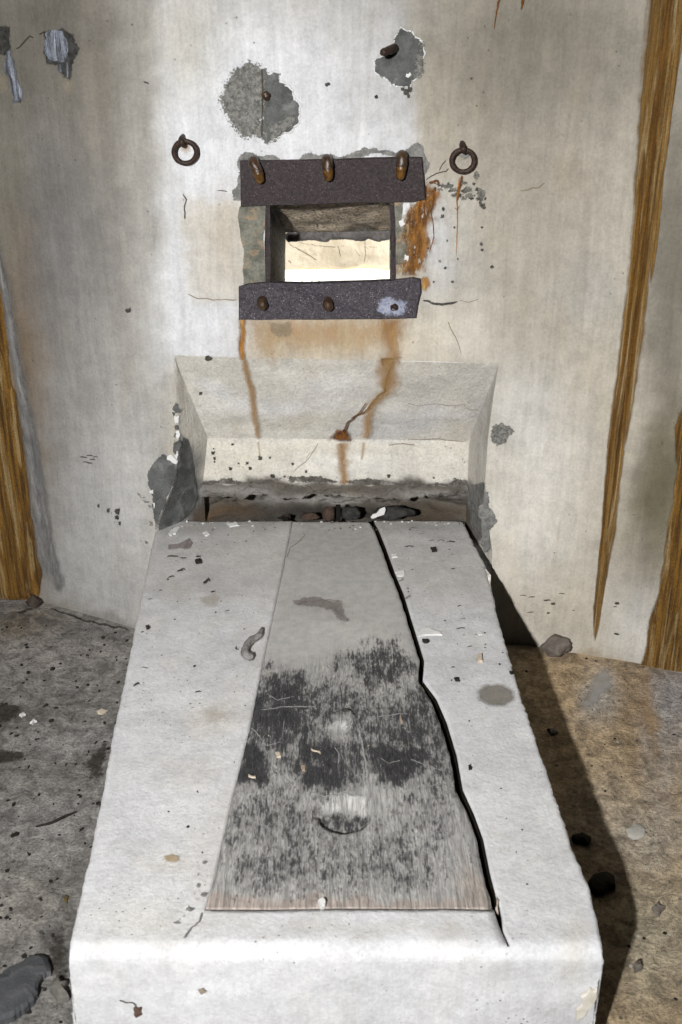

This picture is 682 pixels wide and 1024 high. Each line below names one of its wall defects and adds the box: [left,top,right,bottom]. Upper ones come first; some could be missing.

peeling [0,25,23,103]
peeling [43,28,79,79]
spalling [218,60,302,146]
spalling [373,26,426,98]
corrosion [400,180,440,291]
corrosion [239,320,258,436]
corrosion [330,324,396,483]
spalling [490,423,514,446]
spalling [137,403,497,553]
water stain [293,597,349,621]
crack [374,525,509,946]
water stain [479,685,513,706]